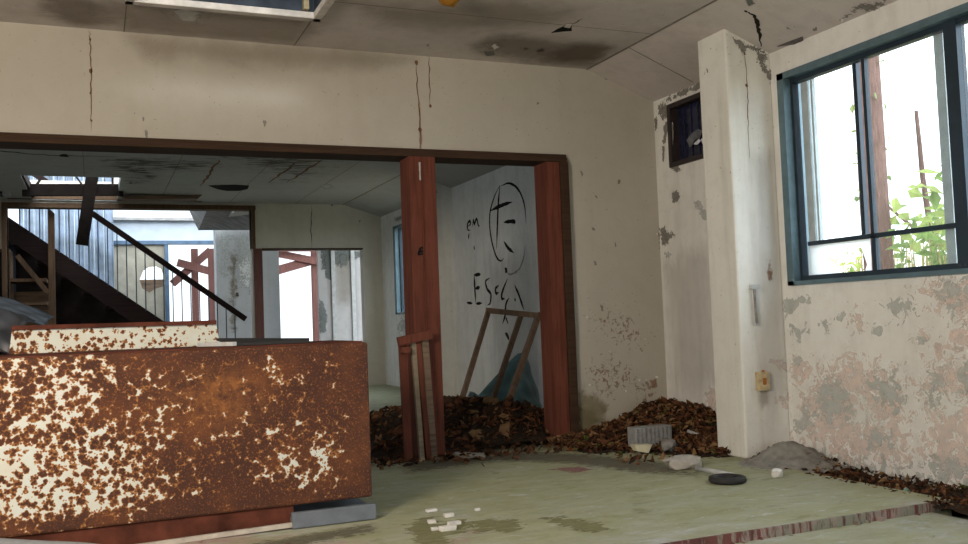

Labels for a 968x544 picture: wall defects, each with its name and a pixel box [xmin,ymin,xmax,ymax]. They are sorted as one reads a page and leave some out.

crack [87,32,95,126]
crack [415,60,432,148]
peeling [653,82,700,172]
crack [744,10,762,158]
peeling [657,226,676,259]
peeling [583,300,661,402]
peeling [770,275,968,489]